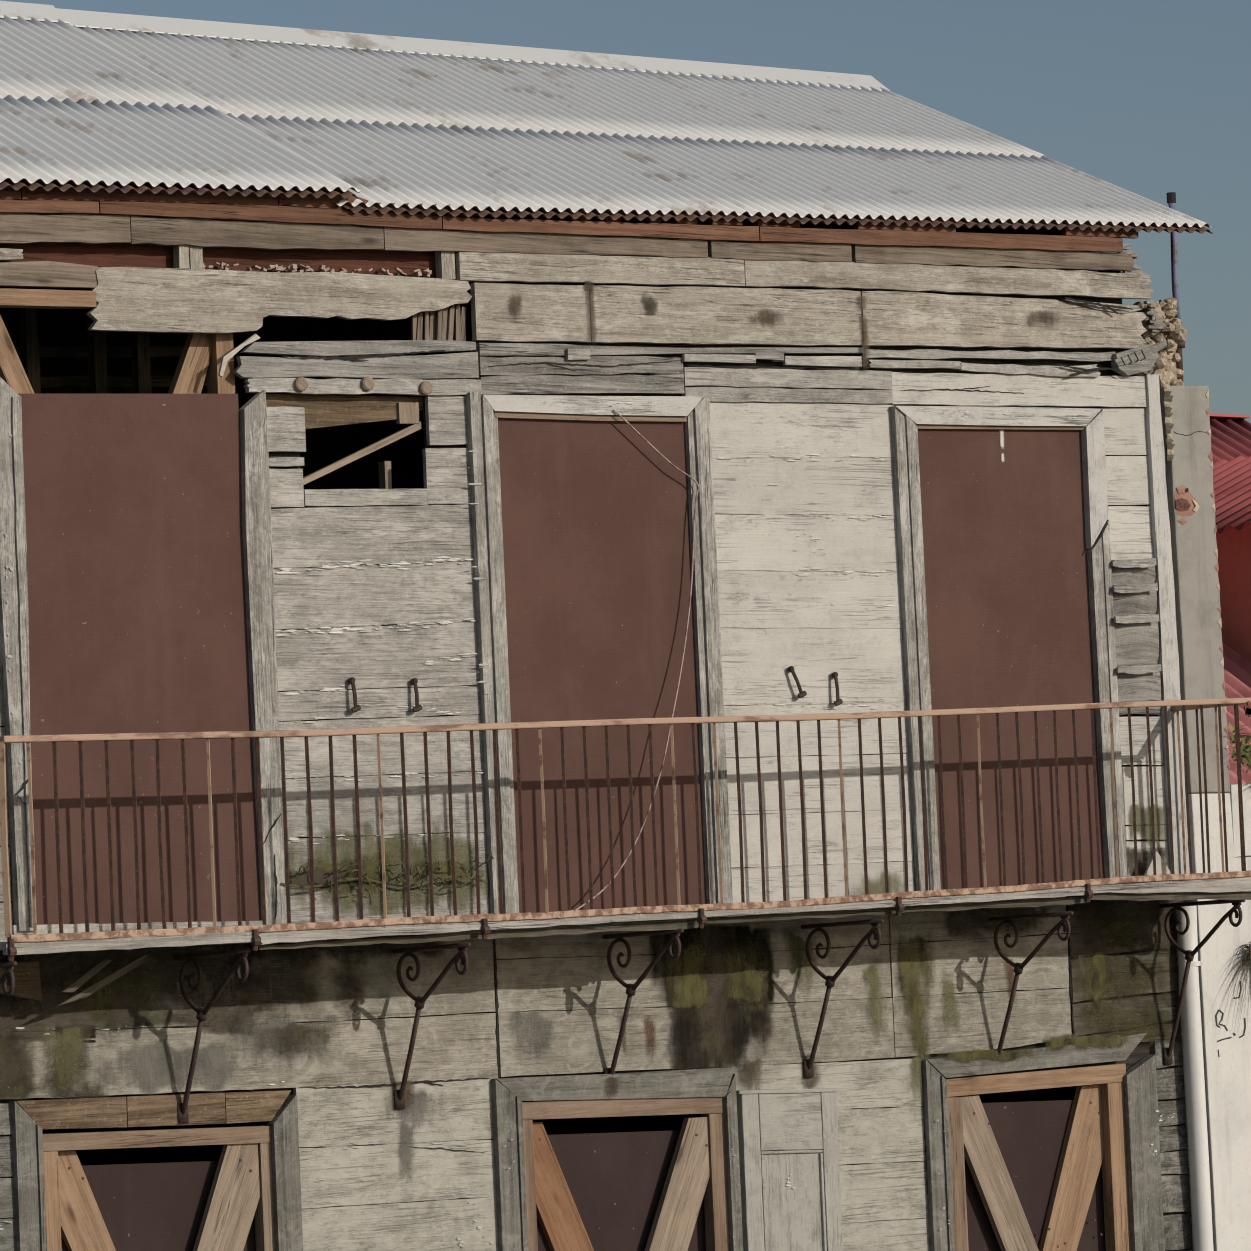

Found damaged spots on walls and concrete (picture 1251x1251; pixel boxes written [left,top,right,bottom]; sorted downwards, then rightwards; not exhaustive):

water stain [0,934,442,1099]
water stain [650,925,774,1090]
water stain [898,936,958,1091]